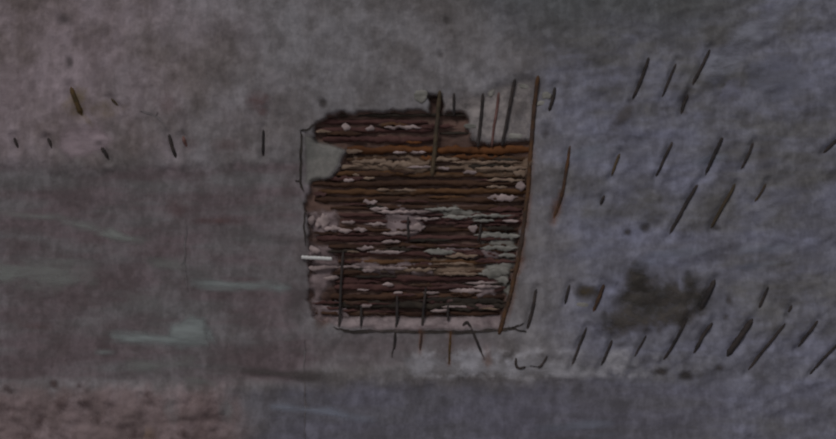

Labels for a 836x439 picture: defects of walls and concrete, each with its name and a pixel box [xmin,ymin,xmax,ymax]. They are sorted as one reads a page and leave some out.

spalling [304,76,552,365]
water stain [607,269,703,333]